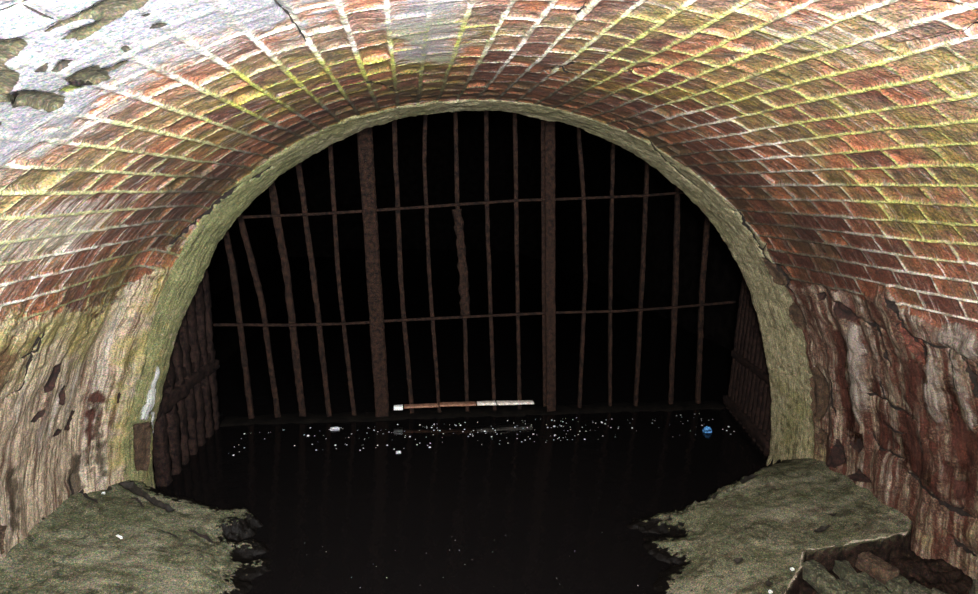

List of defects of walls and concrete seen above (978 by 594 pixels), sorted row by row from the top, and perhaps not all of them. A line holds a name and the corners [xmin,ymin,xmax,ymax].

crack [0,0,54,19]
peeling [45,0,167,41]
peeling [0,38,131,112]
spalling [789,302,807,330]
spalling [817,290,860,321]
spalling [810,366,863,468]
damp [67,454,81,495]
damp [95,442,107,476]
spalling [847,469,872,483]
damp [6,468,21,532]